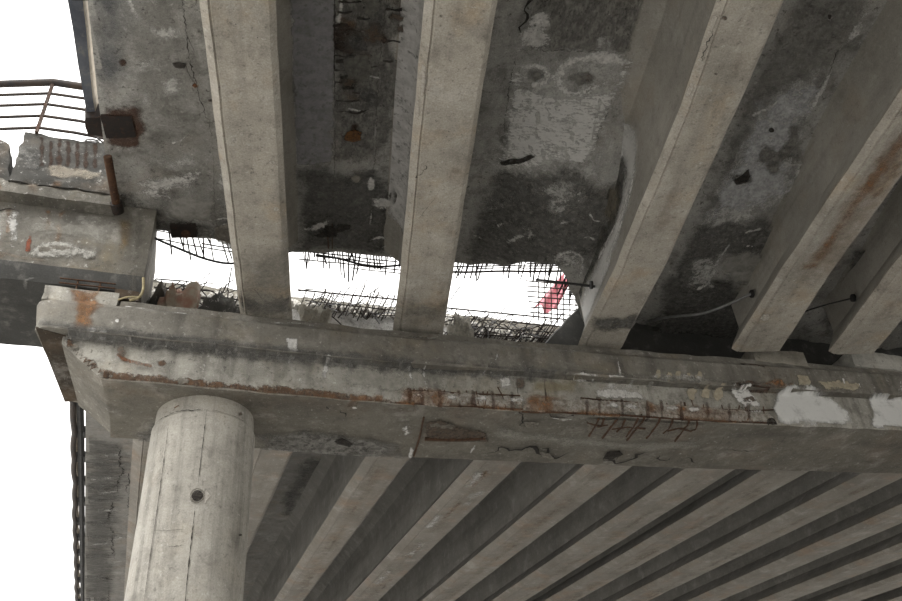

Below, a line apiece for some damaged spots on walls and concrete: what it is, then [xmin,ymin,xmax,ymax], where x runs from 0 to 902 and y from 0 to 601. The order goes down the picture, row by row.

corrosion [107,108,145,147]
crack [182,2,217,226]
spalling [333,0,404,111]
crack [503,0,616,152]
water stain [653,0,867,338]
corrosion [73,290,98,326]
spalling [154,224,239,306]
spalling [298,221,400,325]
spalling [443,262,577,343]
spalling [67,339,777,464]
crack [485,381,574,459]
crack [104,449,130,556]